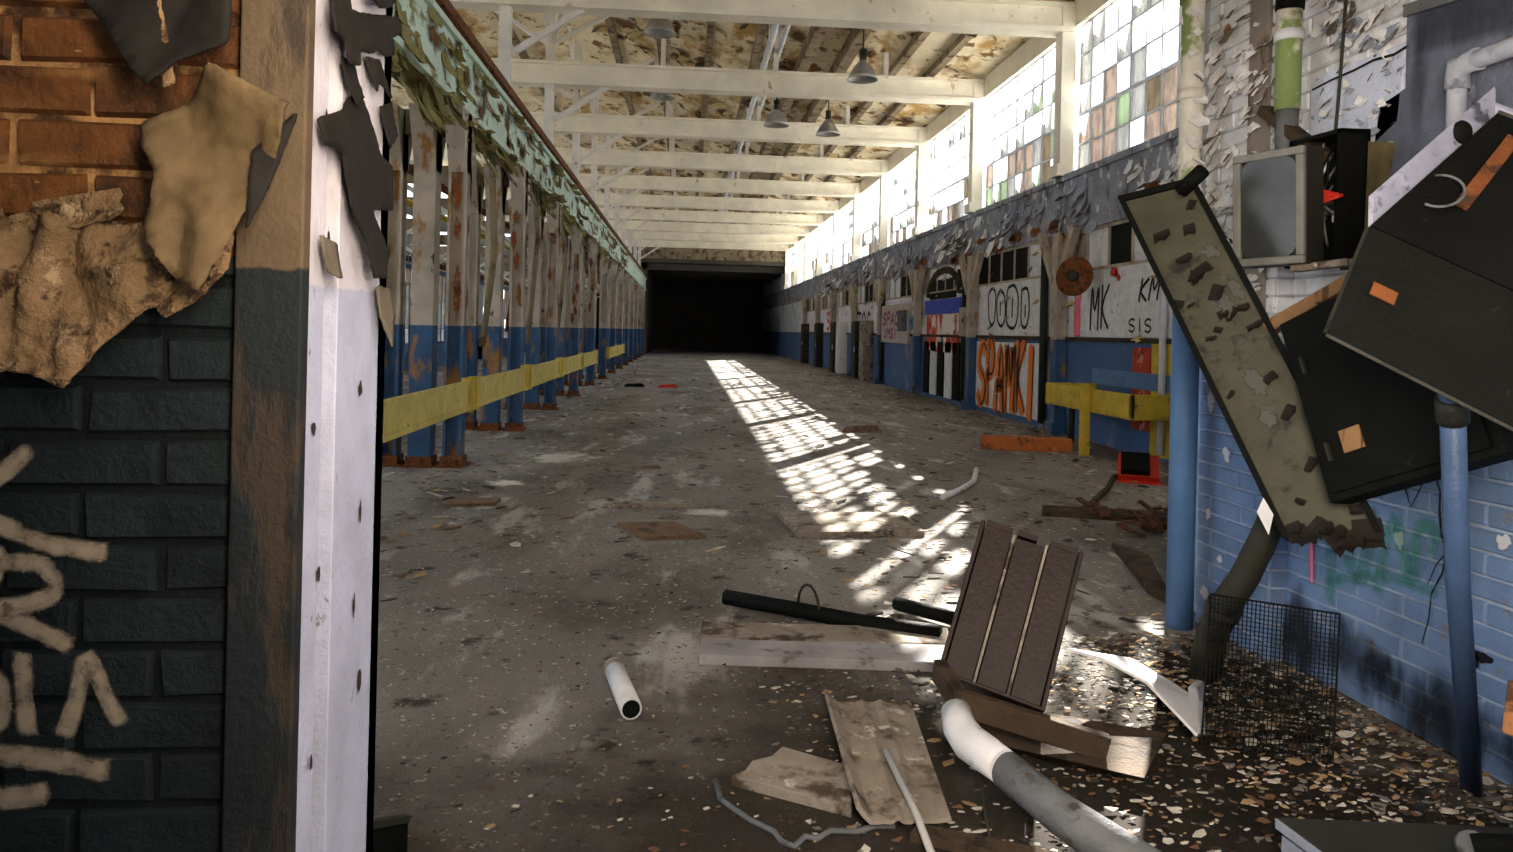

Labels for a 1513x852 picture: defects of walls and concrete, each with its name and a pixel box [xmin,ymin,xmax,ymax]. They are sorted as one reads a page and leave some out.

peeling [0,0,298,389]
peeling [317,0,629,347]
rust [429,24,624,262]
peeling [591,18,722,68]
peeling [615,91,771,119]
peeling [716,24,797,69]
peeling [798,143,866,178]
peeling [1309,0,1421,142]
rust [453,267,468,317]
rust [511,210,527,306]
rust [548,270,596,323]
peeling [821,178,1098,335]